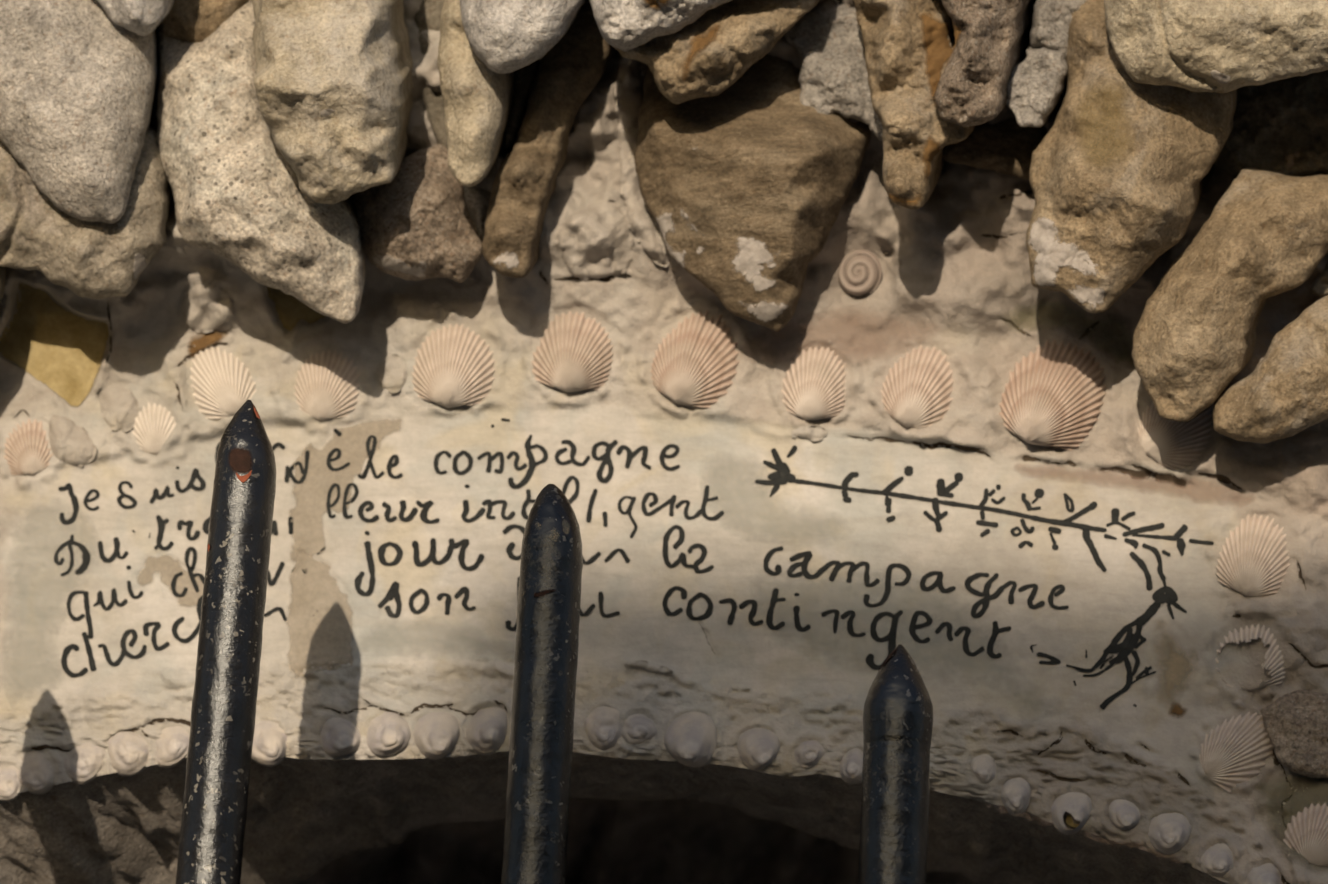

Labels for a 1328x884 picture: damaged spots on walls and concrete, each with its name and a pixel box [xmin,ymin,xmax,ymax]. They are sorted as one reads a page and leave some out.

crack [539,271,632,284]
crack [849,436,990,457]
crack [1022,455,1242,490]